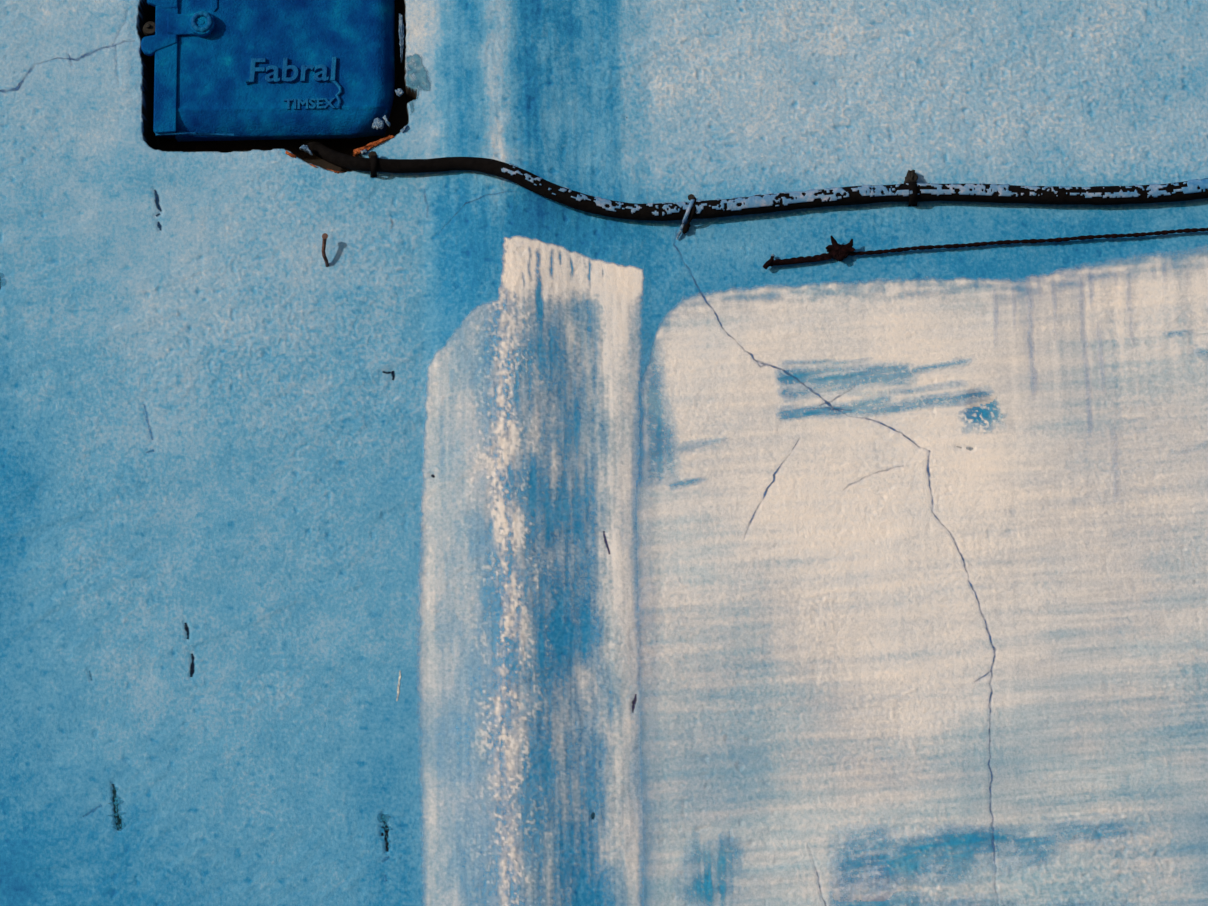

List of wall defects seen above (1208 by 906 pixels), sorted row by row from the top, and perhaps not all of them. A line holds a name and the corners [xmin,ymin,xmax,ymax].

crack [693,278,938,523]
crack [955,543,995,862]